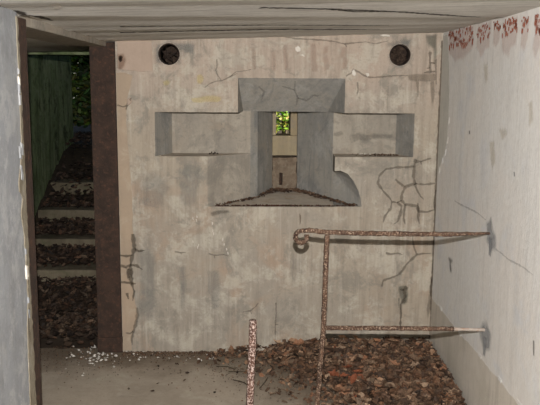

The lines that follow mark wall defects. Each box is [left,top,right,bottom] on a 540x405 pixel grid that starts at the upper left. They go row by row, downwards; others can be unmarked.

rust [448,14,540,51]
crack [120,234,144,301]